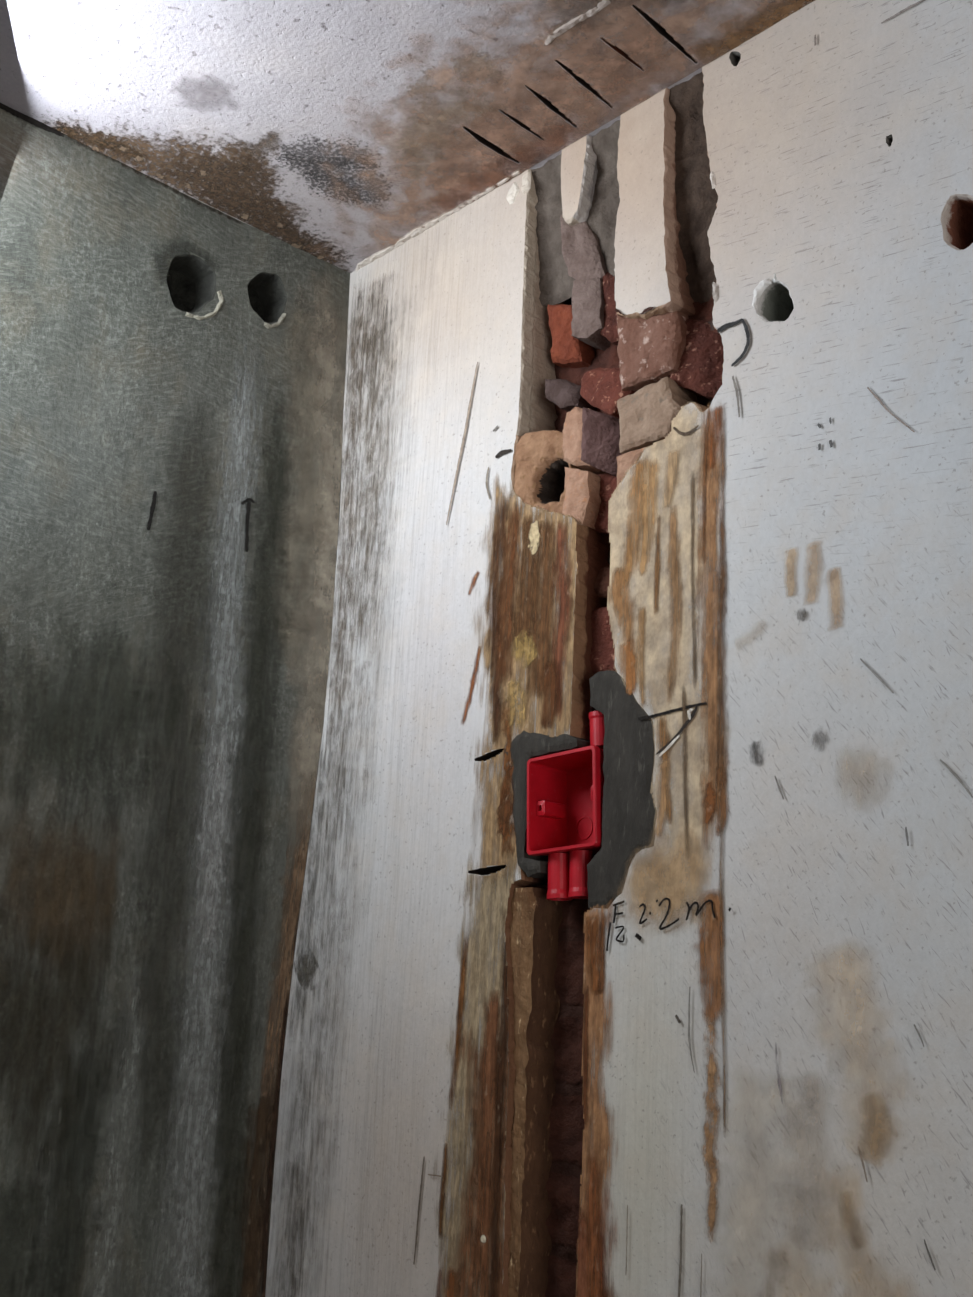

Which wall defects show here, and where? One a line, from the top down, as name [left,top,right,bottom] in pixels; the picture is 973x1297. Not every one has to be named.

mould [41,114,353,271]
peeling [185,290,224,320]
peeling [263,313,286,329]
peeling [542,0,611,45]
leakage [366,0,815,248]
spalling [511,214,724,537]
peeling [752,273,779,308]
leakage [0,285,389,1297]
corrosion [437,481,578,1297]
corrosion [607,407,727,1239]
corrosion [575,905,613,1297]